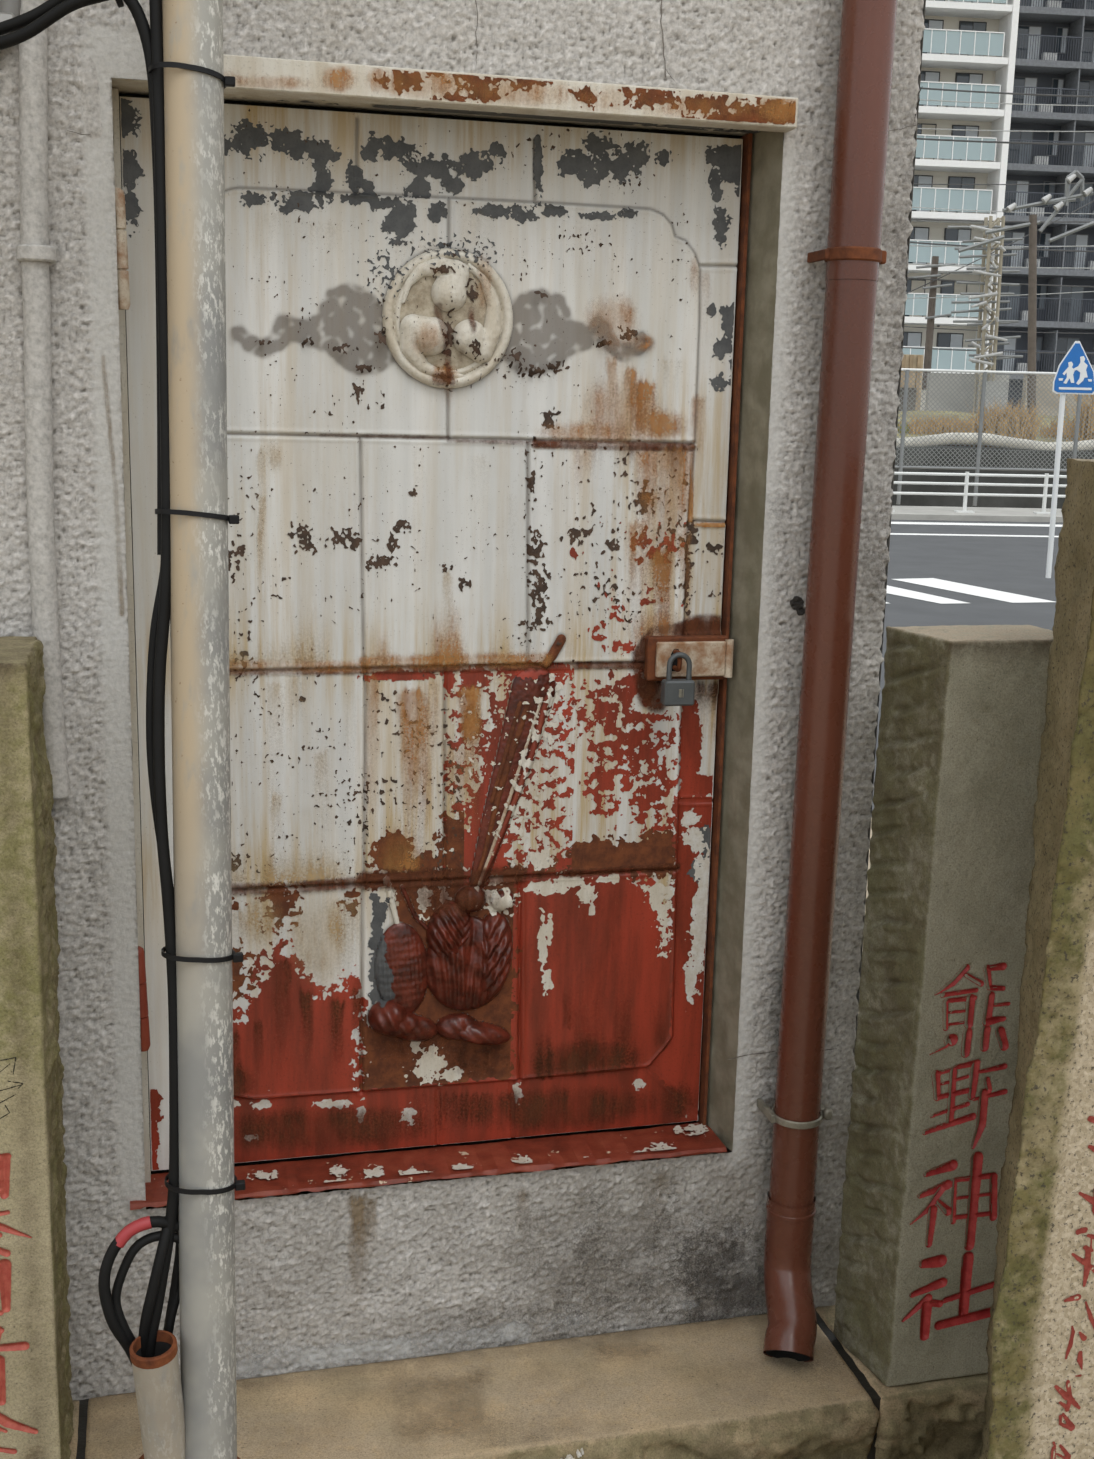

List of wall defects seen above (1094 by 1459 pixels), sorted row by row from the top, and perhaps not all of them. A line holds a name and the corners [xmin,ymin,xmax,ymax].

rust [329,68,350,89]
rust [434,73,462,91]
rust [691,98,796,125]
rust [533,369,725,528]
peeling [224,70,795,1184]
rust [574,525,721,712]
rust [287,635,553,778]
rust [232,847,544,934]
rust [566,863,680,878]
rust [233,1068,246,1097]
rust [329,1110,401,1144]
rust [453,1040,635,1127]